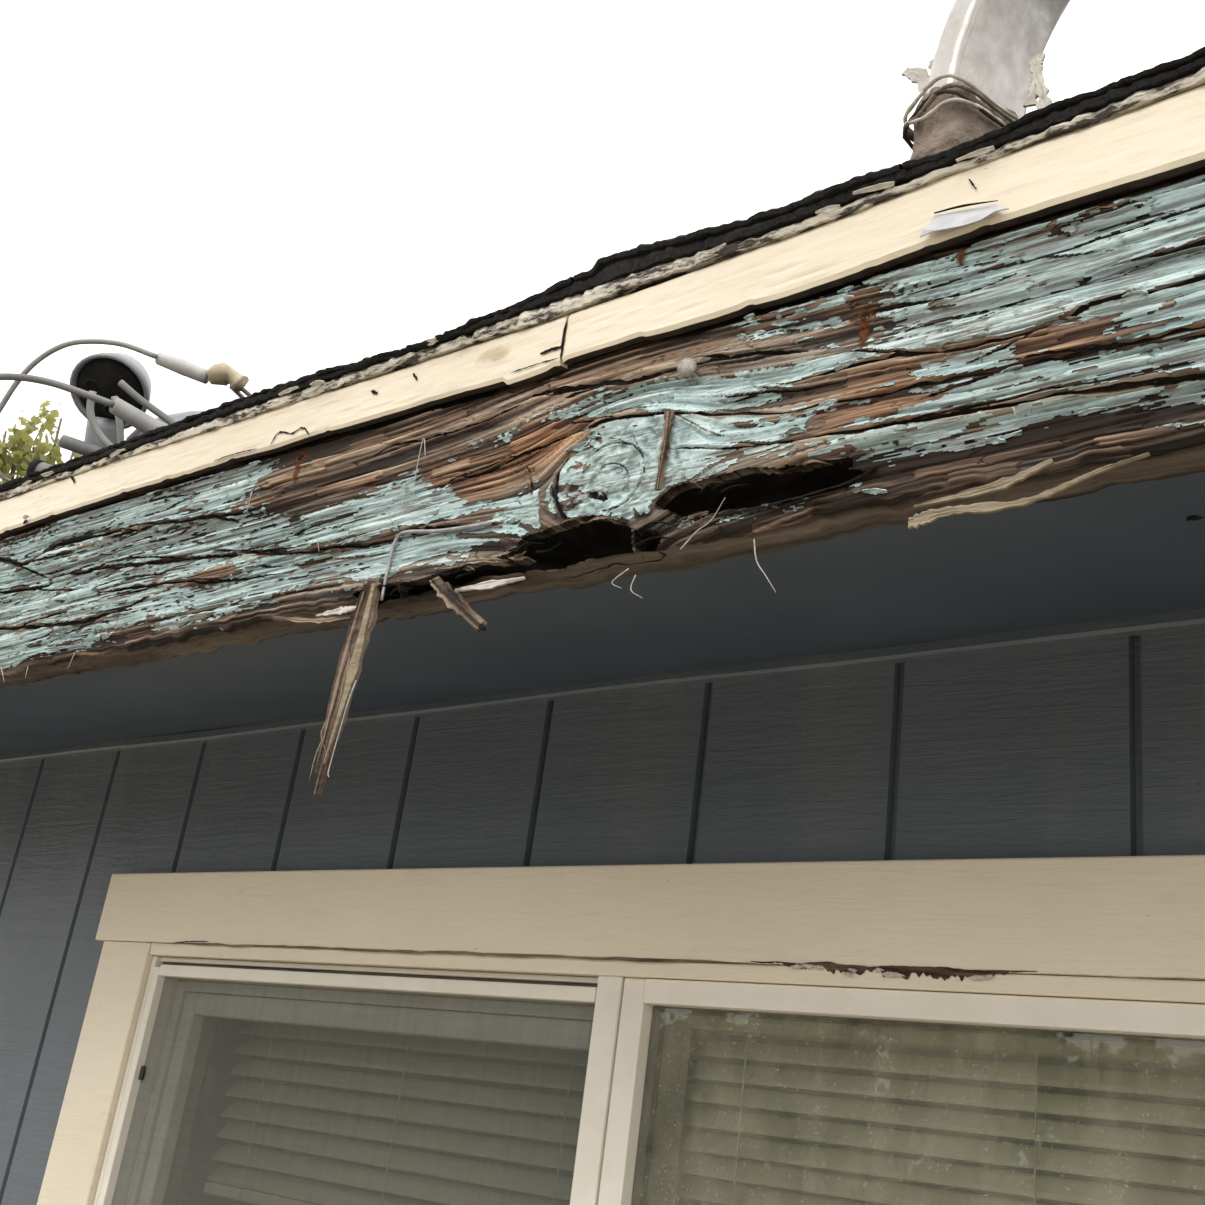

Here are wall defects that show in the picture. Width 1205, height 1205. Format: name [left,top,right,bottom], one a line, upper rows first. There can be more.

peeling [920,200,1009,238]
peeling [1146,234,1205,257]
peeling [229,276,1205,519]
peeling [222,498,549,631]
peeling [81,551,265,656]
crack [146,941,781,965]
crack [1051,973,1205,981]